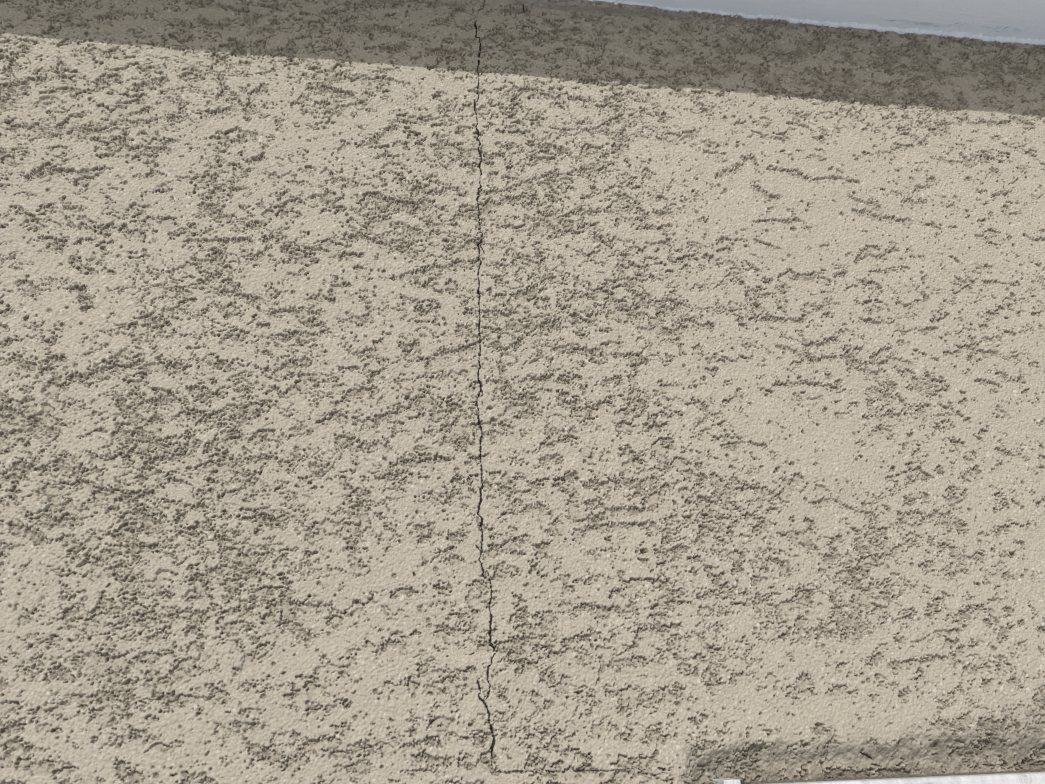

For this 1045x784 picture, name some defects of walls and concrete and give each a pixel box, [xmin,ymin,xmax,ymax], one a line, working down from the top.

crack [474,0,712,784]